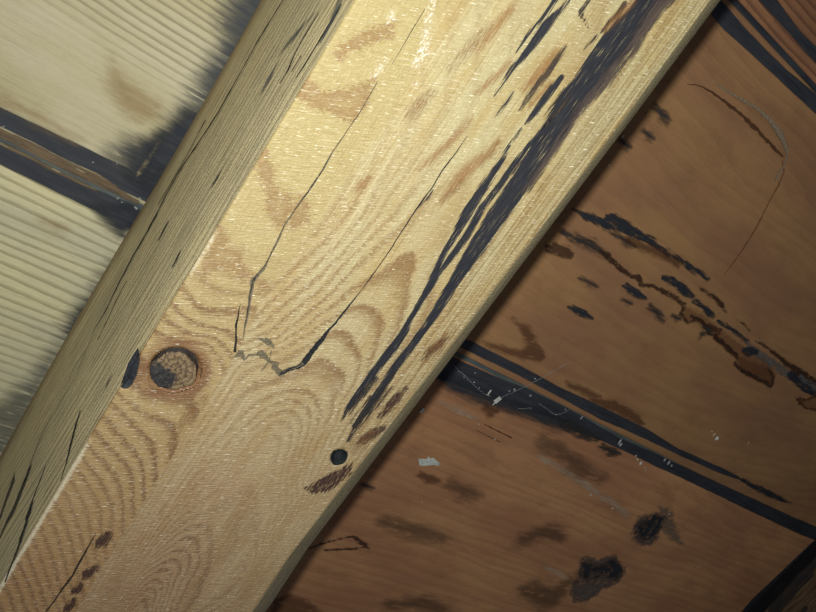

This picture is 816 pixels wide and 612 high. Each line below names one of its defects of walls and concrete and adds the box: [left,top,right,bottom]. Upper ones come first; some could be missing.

damp [0,0,261,237]
crack [233,83,468,378]
damp [342,0,675,453]
damp [545,208,816,411]
crack [688,84,785,275]
damp [304,463,352,494]
damp [437,339,816,612]